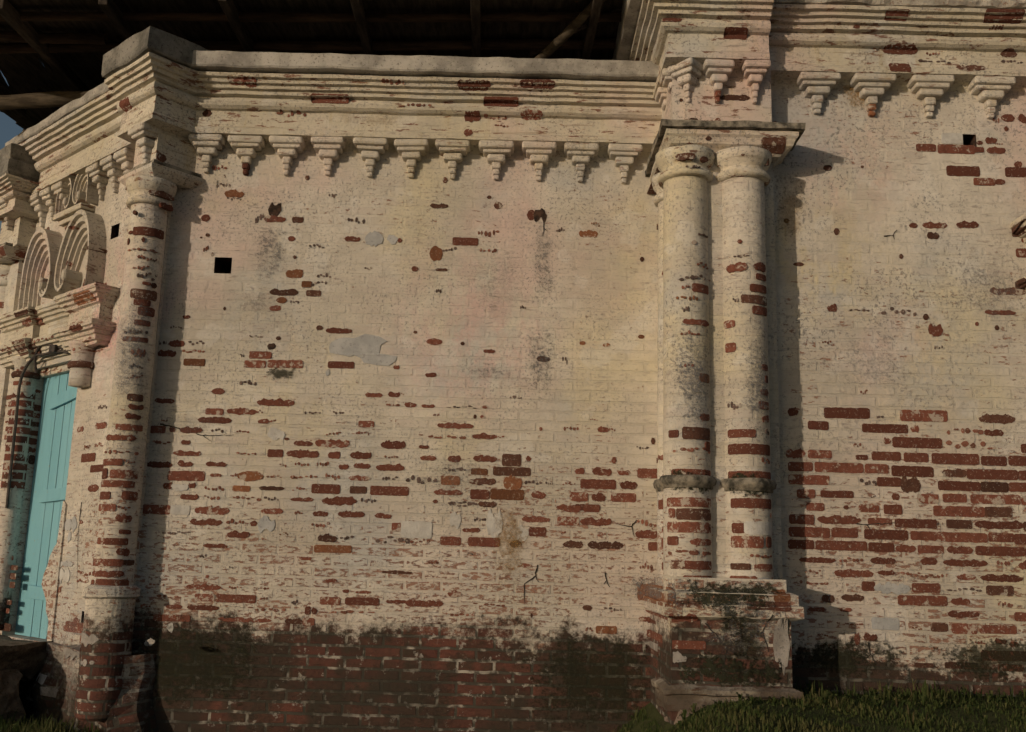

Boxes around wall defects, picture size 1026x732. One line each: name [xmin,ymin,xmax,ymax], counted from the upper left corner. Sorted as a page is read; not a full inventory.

flaking render [457,79,555,136]
flaking render [916,114,1026,186]
flaking render [87,210,205,378]
spalling [200,214,232,274]
peeling [269,255,331,311]
flaking render [429,230,500,271]
flaking render [726,239,767,316]
peeling [909,220,979,239]
flaking render [728,364,771,479]
flaking render [785,407,1026,647]
flaking render [149,575,505,626]
flaking render [730,523,791,612]